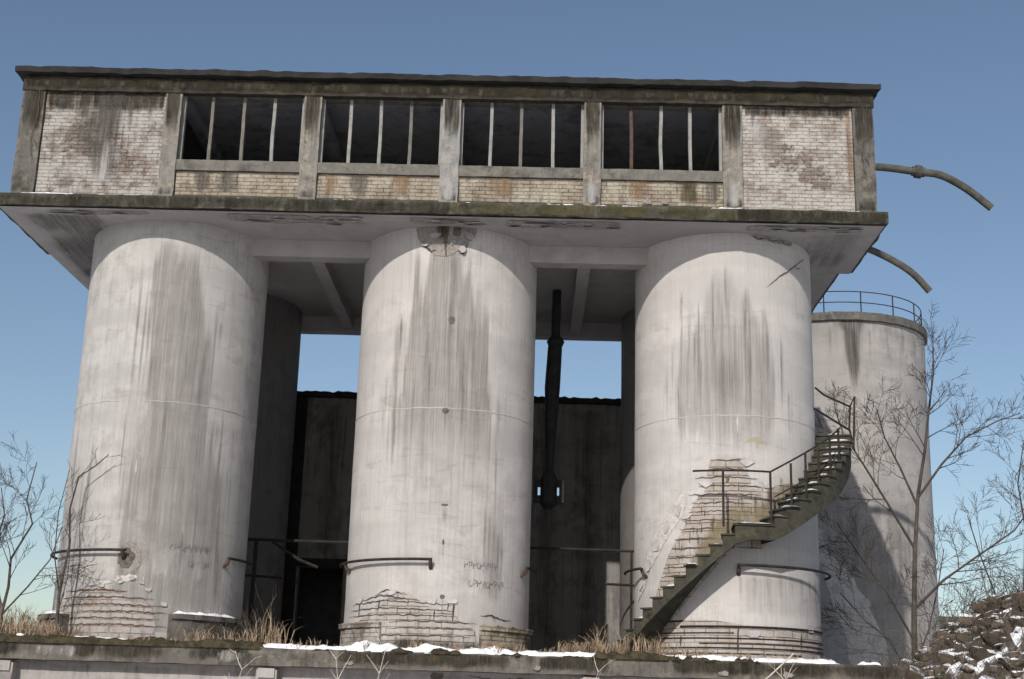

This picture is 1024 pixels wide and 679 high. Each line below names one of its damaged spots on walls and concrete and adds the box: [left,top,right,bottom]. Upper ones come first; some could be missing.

leakage [166,92,180,125]
spalling [410,218,486,257]
leakage [839,321,861,377]
spalling [54,542,167,639]
spalling [351,589,477,649]
spalling [637,457,823,679]